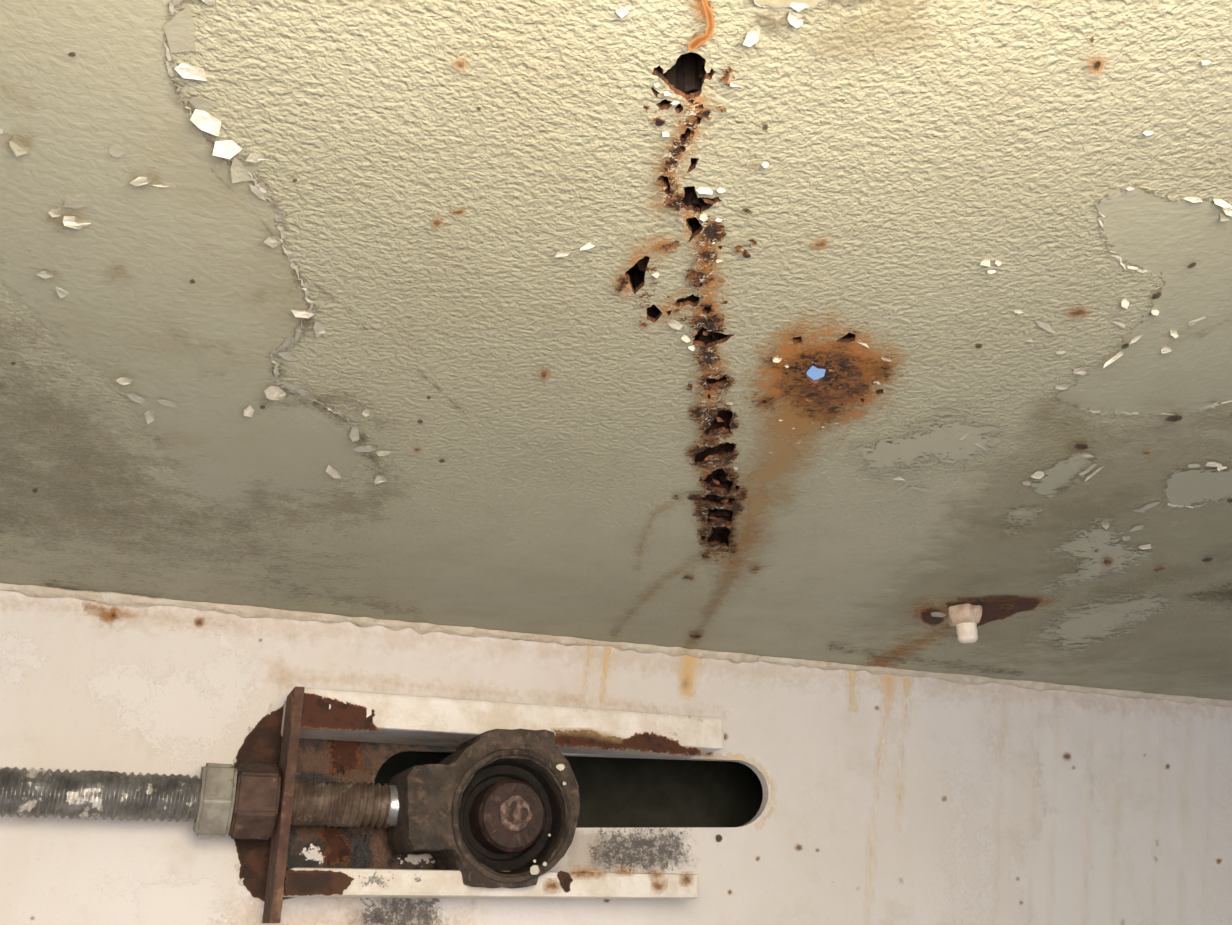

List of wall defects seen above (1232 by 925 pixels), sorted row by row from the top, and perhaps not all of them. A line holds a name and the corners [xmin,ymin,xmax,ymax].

peeling [743,0,832,47]
peeling [0,0,390,516]
peeling [555,242,594,257]
peeling [1055,186,1232,420]
corrosion [702,324,904,574]
corrosion [830,596,1054,709]
peeling [1001,450,1105,538]
peeling [1030,461,1232,658]